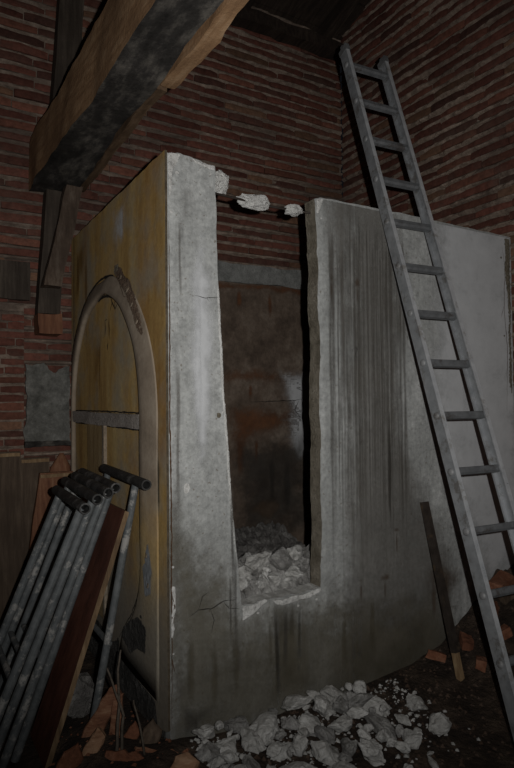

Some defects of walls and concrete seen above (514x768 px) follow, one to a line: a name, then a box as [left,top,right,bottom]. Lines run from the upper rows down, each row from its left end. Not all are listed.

spalling [168,152,215,196]
crack [169,248,238,700]
water stain [170,207,454,739]